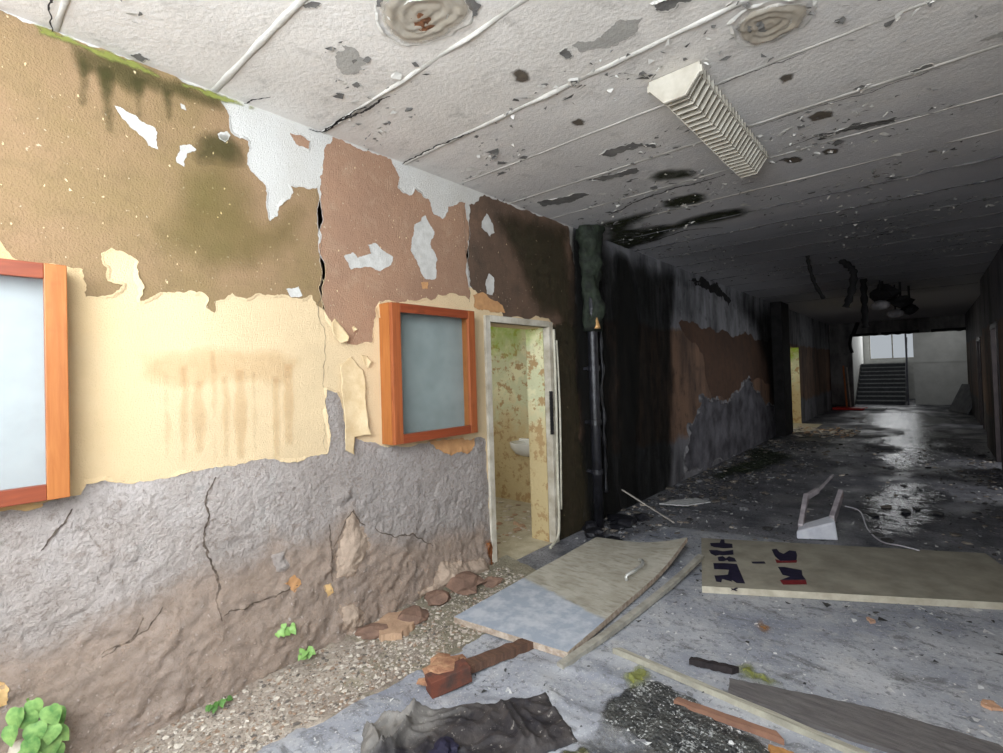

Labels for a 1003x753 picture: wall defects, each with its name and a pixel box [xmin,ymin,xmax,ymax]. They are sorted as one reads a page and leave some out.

crack [46,0,54,32]
peeling [650,0,692,13]
peeling [884,0,949,27]
peeling [0,10,1003,346]
water stain [653,170,692,180]
water stain [664,194,703,208]
water stain [500,209,744,540]
peeling [607,320,1002,663]
crack [203,477,302,621]
flaking render [0,355,542,753]
crack [329,509,433,581]
peeling [600,667,751,753]